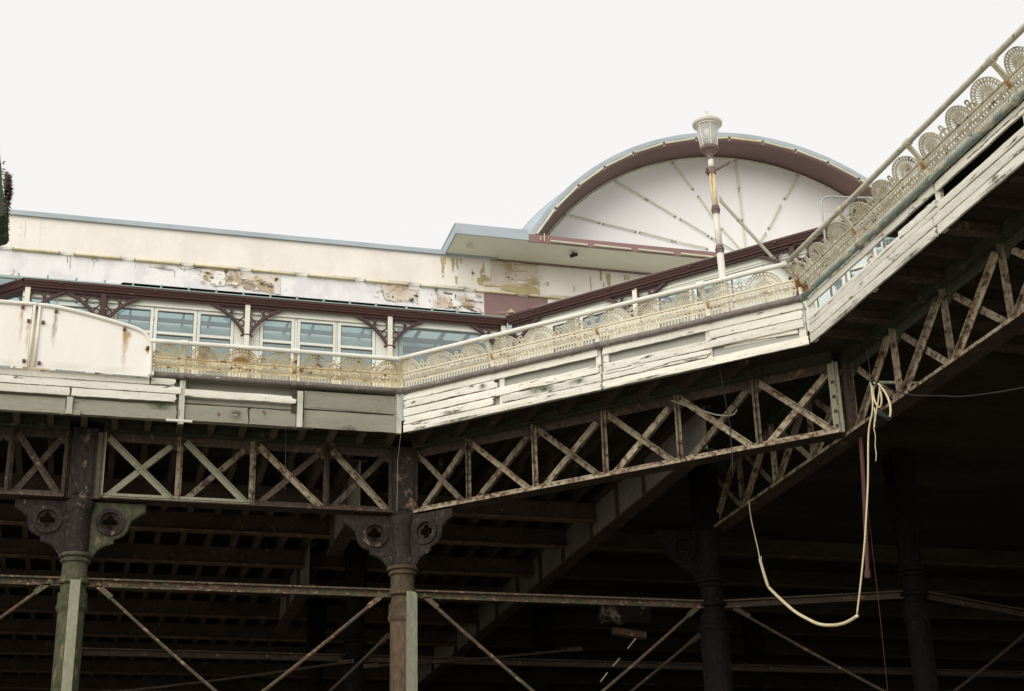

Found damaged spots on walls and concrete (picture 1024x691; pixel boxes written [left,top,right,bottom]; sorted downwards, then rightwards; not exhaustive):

peeling [200,269,281,294]
peeling [373,259,546,312]